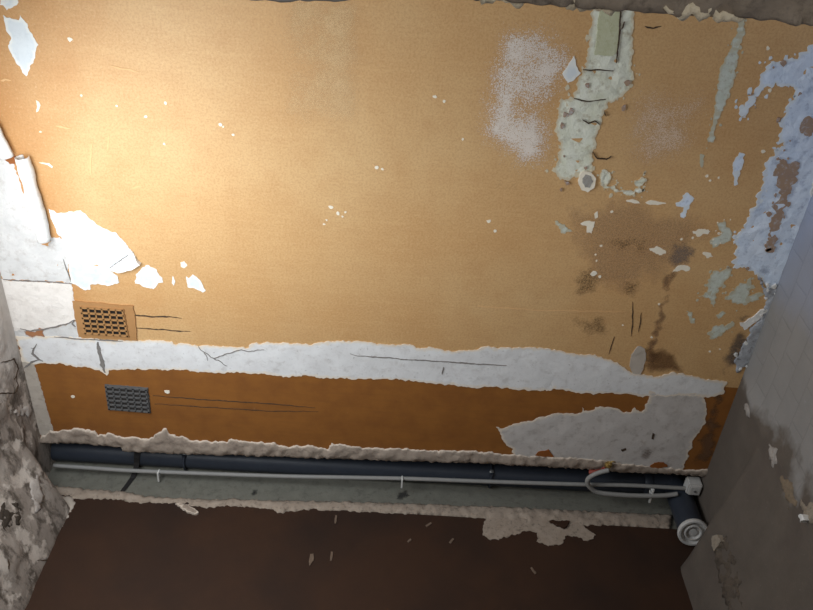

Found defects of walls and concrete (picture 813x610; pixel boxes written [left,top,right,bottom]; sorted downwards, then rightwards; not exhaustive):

peeling [0,0,38,76]
efflorescence [476,20,577,176]
peeling [545,0,694,218]
peeling [663,3,813,373]
crack [0,320,123,394]
crack [135,315,263,366]
peeling [0,155,727,477]
leakage [648,311,677,369]
spalling [55,485,673,546]
flaking render [711,535,743,610]